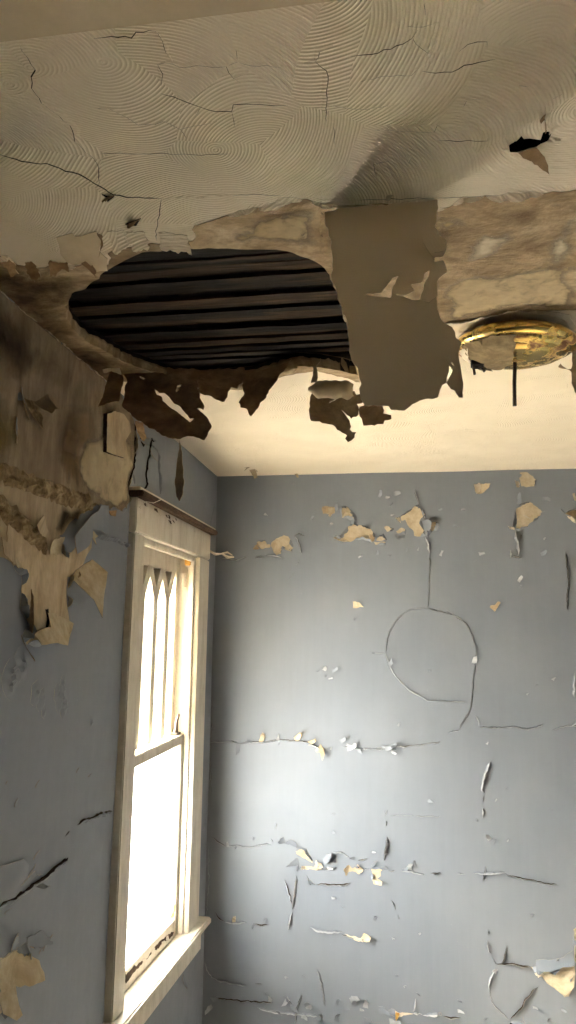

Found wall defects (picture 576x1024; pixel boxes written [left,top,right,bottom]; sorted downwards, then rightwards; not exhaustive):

crack [94,30,173,61]
crack [304,4,495,144]
crack [1,45,287,241]
hole [509,132,552,152]
peeling [366,190,576,332]
peeling [0,197,389,661]
peeling [310,490,444,558]
peeling [507,472,576,531]
crack [209,489,576,794]
crack [0,810,112,908]
peeling [278,836,388,885]
peeling [531,928,576,1013]